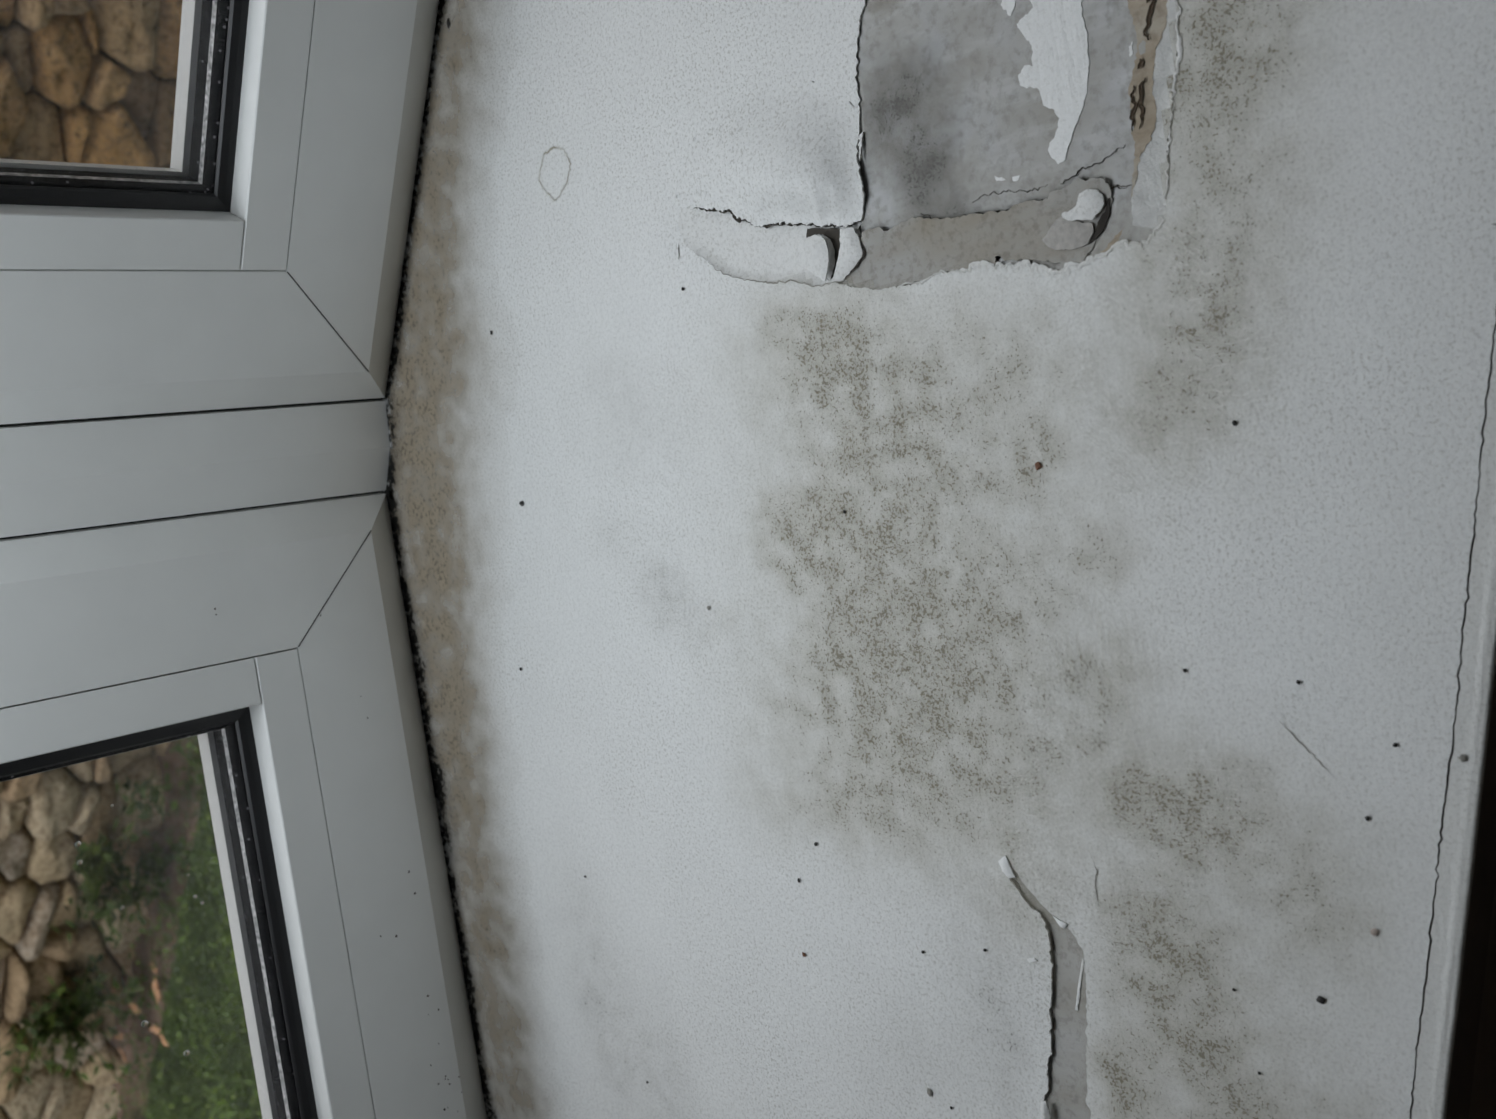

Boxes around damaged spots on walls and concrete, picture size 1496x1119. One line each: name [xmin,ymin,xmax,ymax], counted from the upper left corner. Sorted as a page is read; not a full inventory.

peeling [833,0,1182,290]
leakage [1132,0,1298,450]
leakage [381,0,534,1119]
leakage [759,282,1133,925]
peeling [998,856,1091,1119]
leakage [1094,756,1353,1119]